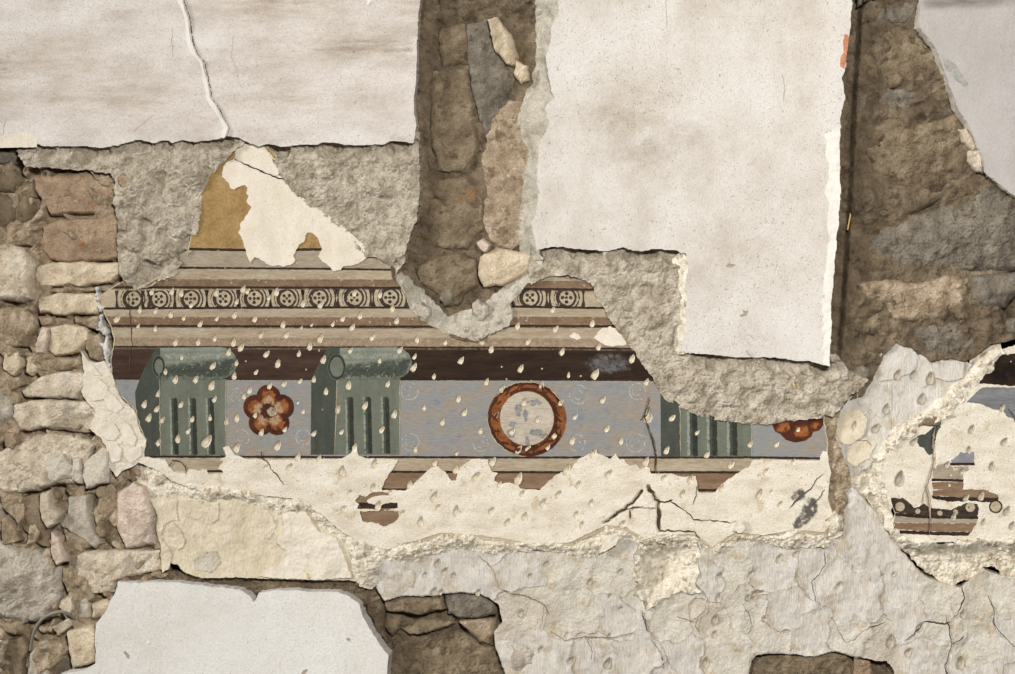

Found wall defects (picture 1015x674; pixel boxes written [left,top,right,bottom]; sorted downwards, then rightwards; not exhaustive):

crack [171,0,284,180]
spalling [914,0,1015,198]
spalling [0,0,971,480]
peeling [0,147,1015,674]
crack [604,399,735,538]
crack [790,474,824,507]
crack [921,426,936,535]
crack [478,555,664,668]
crack [811,554,885,643]
crack [906,589,1013,674]